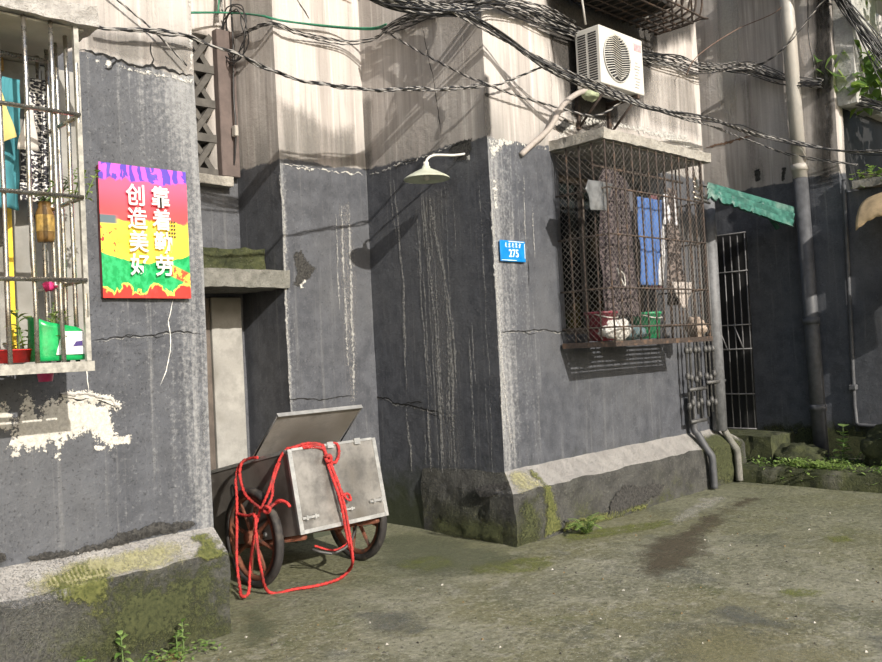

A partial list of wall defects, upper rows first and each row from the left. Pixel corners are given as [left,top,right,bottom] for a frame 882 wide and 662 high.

crack [96,330,204,342]
peeling [293,249,315,288]
damp [336,205,355,401]
damp [390,180,407,389]
damp [416,191,459,472]
crack [501,327,566,335]
peeling [0,394,132,461]
crack [286,394,350,402]
crack [377,396,445,416]
damp [640,498,759,575]